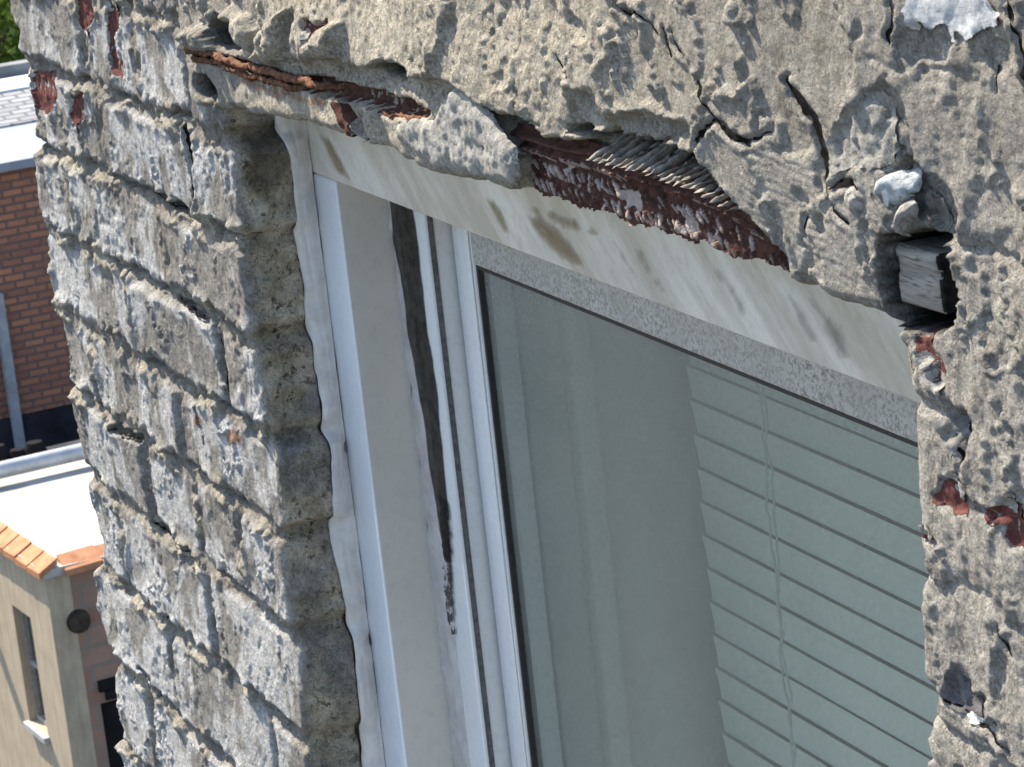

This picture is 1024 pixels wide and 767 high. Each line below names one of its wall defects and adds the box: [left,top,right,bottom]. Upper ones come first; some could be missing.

crack [615,2,685,58]
crack [885,0,893,45]
peeling [899,0,999,42]
crack [996,0,1024,91]
crack [183,123,194,198]
corrosion [183,47,431,143]
corrosion [510,122,790,273]
crack [695,80,771,156]
crack [786,76,857,225]
water stain [390,201,455,635]
spalling [937,669,986,727]